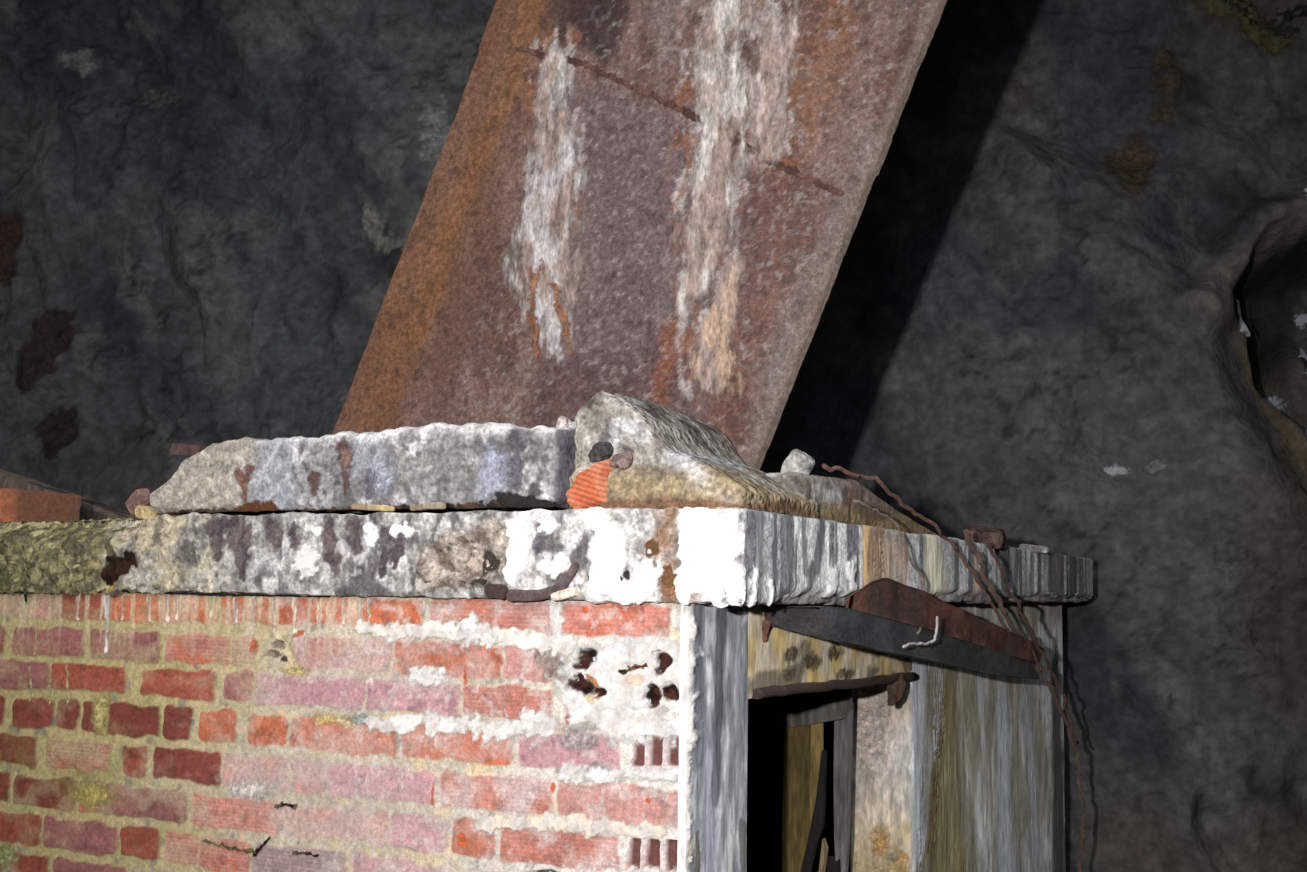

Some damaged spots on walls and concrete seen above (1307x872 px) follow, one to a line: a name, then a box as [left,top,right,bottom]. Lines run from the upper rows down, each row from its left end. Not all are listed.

damp [504,46,586,360]
damp [670,0,800,395]
corrosion [526,258,573,358]
damp [313,507,858,872]
spalling [567,648,607,704]
spalling [618,650,679,716]
corrosion [762,619,772,642]
crack [203,801,319,857]